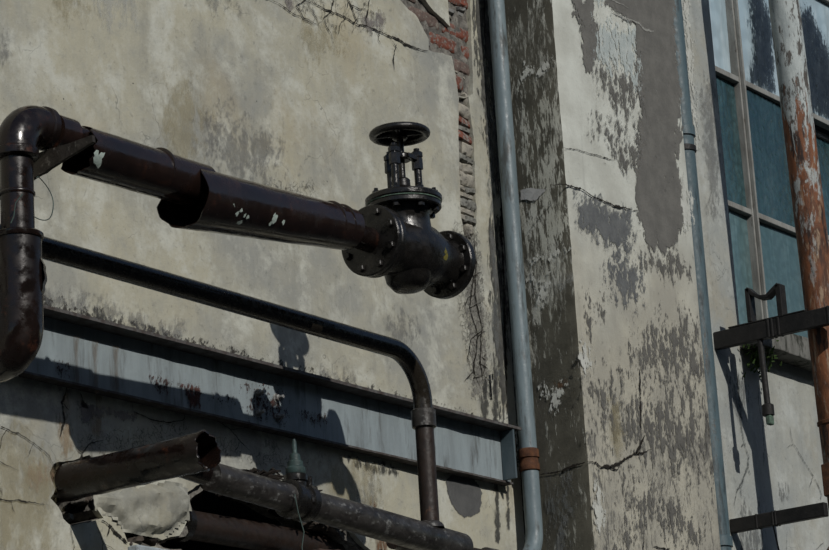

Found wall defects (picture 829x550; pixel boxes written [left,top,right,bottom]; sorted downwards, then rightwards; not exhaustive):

crack [274,0,428,70]
crack [551,183,637,212]
peeling [572,0,731,550]
crack [60,387,187,460]
corrosion [149,371,202,409]
corrosion [213,375,327,436]
crack [540,373,652,475]
crack [0,426,53,511]
crack [98,520,127,550]
damp [446,475,482,518]
damp [493,484,510,542]